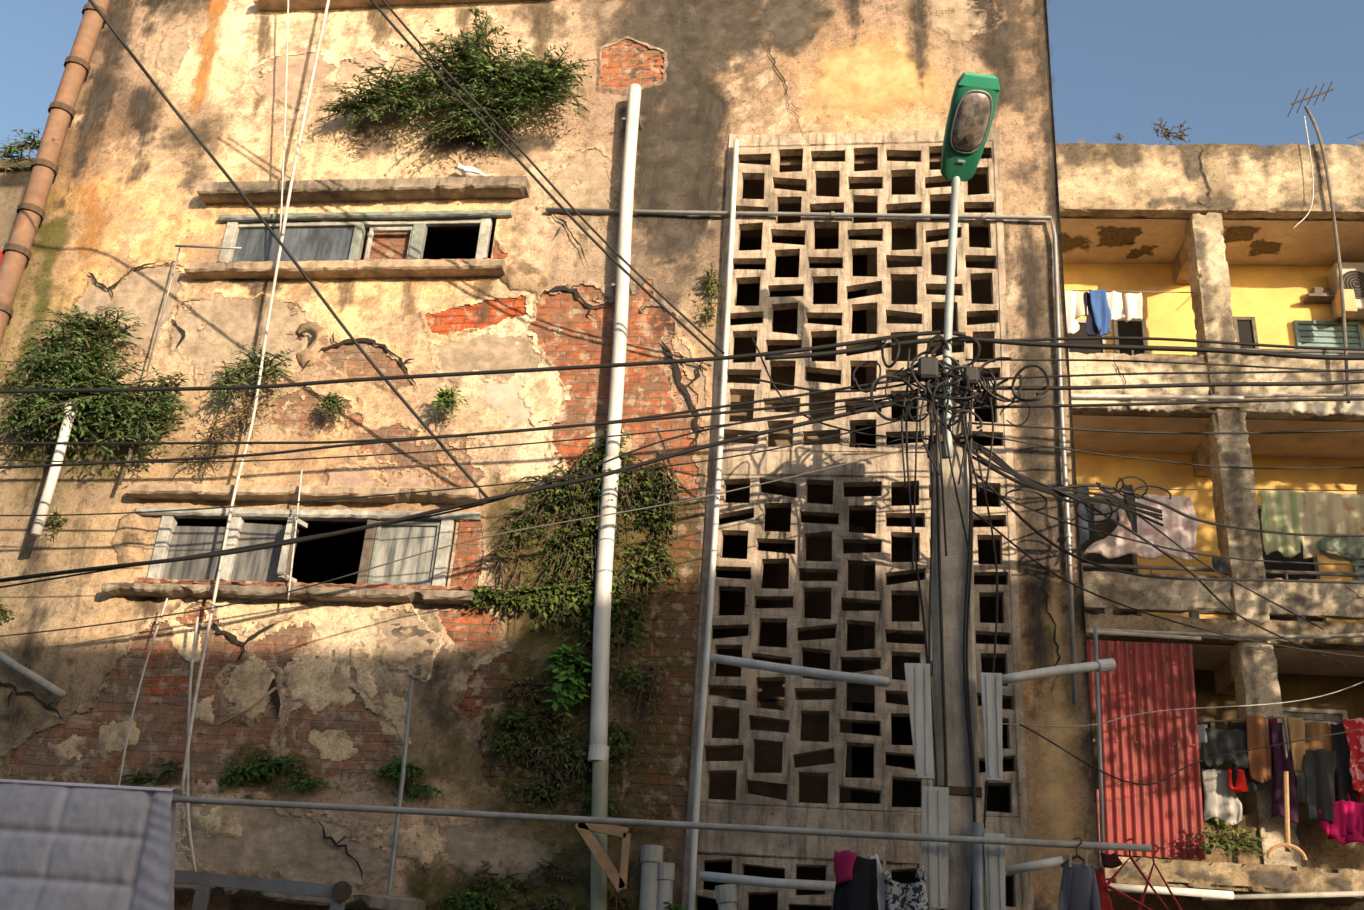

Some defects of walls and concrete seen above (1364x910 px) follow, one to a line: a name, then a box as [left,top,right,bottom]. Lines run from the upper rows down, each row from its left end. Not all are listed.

flaking render [595,36,668,96]
water stain [808,0,941,113]
water stain [602,0,861,272]
water stain [971,0,1094,219]
water stain [1149,197,1236,208]
crack [1197,146,1211,206]
water stain [1313,151,1327,185]
peeling [1061,226,1158,259]
peeling [1223,226,1281,256]
flaking render [61,252,713,839]
flaking render [0,512,593,894]
crack [319,822,366,884]